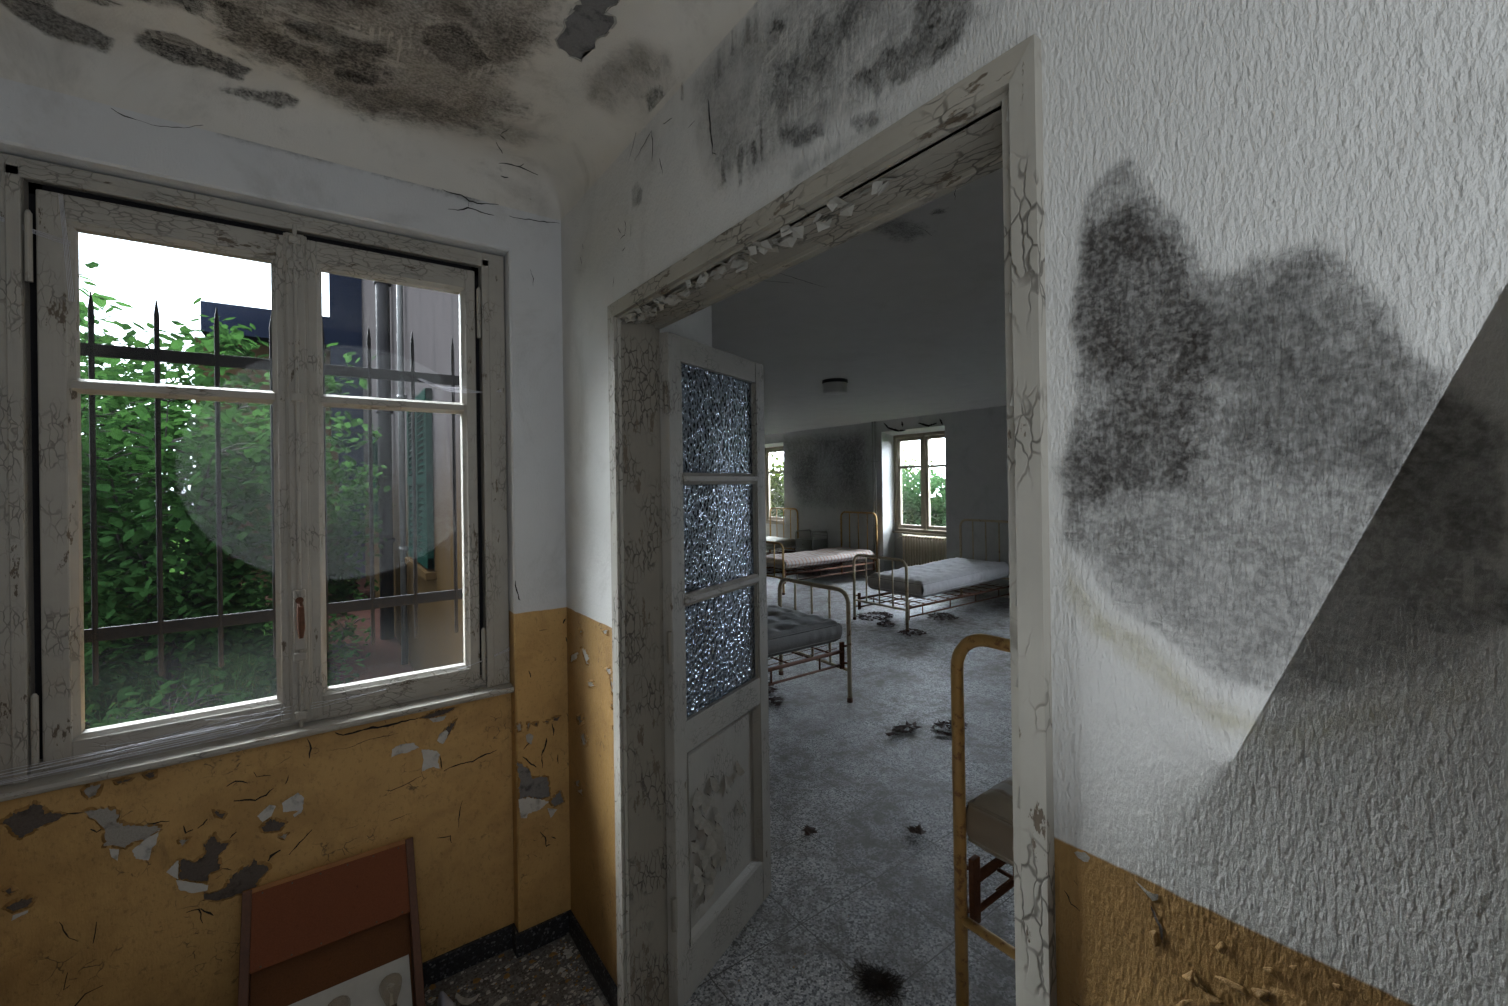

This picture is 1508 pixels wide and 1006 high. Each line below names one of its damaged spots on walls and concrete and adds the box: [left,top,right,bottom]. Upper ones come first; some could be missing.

damp [2,0,111,50]
damp [138,0,548,122]
flaking render [555,0,620,62]
damp [857,0,967,88]
mould [1077,210,1222,496]
peeling [569,627,623,754]
peeling [391,707,458,771]
peeling [0,769,272,902]
peeling [258,793,304,841]
peeling [516,760,585,818]
peeling [1,884,38,921]
peeling [1175,965,1297,1006]